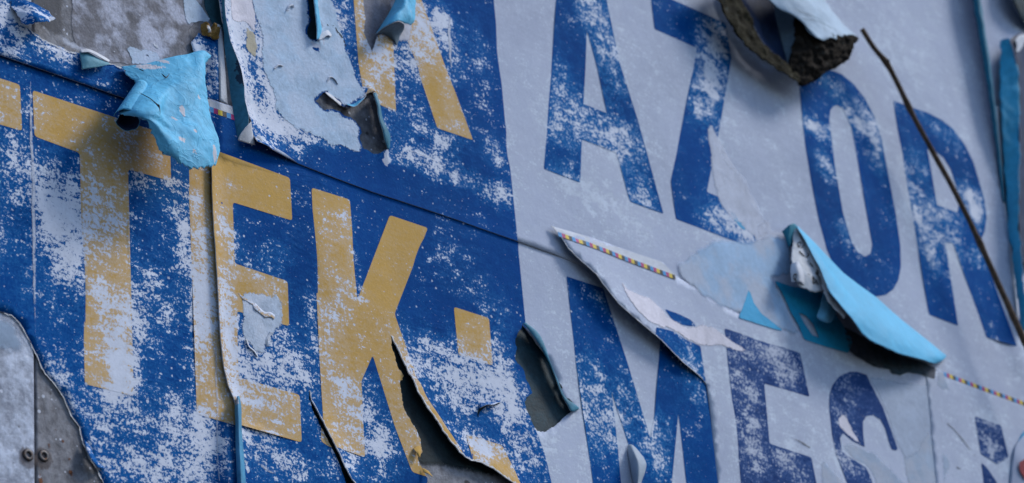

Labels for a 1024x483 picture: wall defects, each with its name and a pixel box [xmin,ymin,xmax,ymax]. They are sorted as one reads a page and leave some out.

peeling [79,49,220,170]
peeling [231,0,365,151]
peeling [718,0,859,87]
peeling [238,292,283,357]
peeling [551,225,745,379]
peeling [679,126,946,457]
peeling [84,440,105,468]